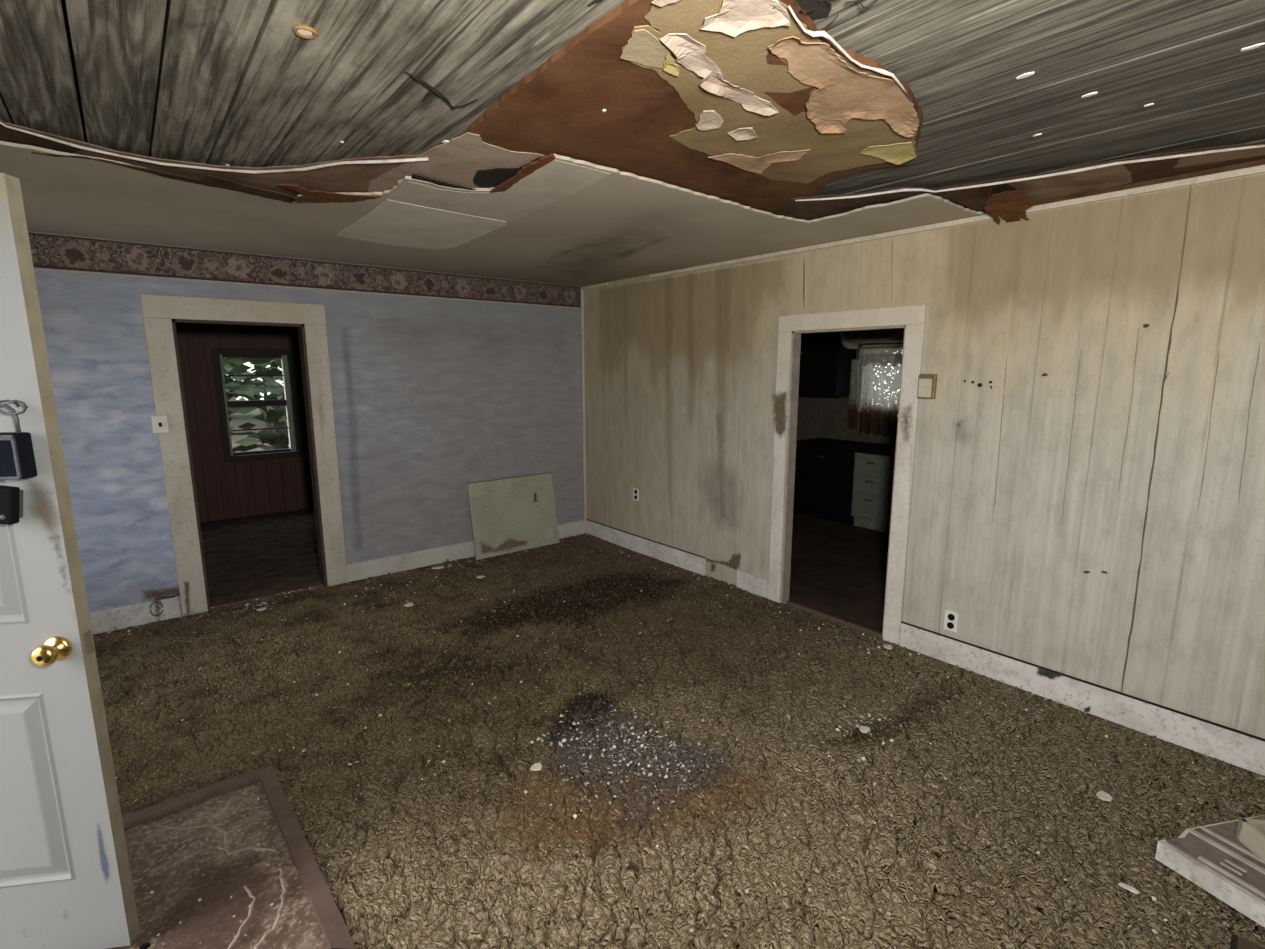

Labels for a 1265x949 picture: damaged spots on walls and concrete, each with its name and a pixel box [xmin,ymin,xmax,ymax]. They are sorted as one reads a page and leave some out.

crack [405,71,478,110]
peeling [984,186,1035,225]
crack [1118,185,1192,692]
damp [706,554,741,571]